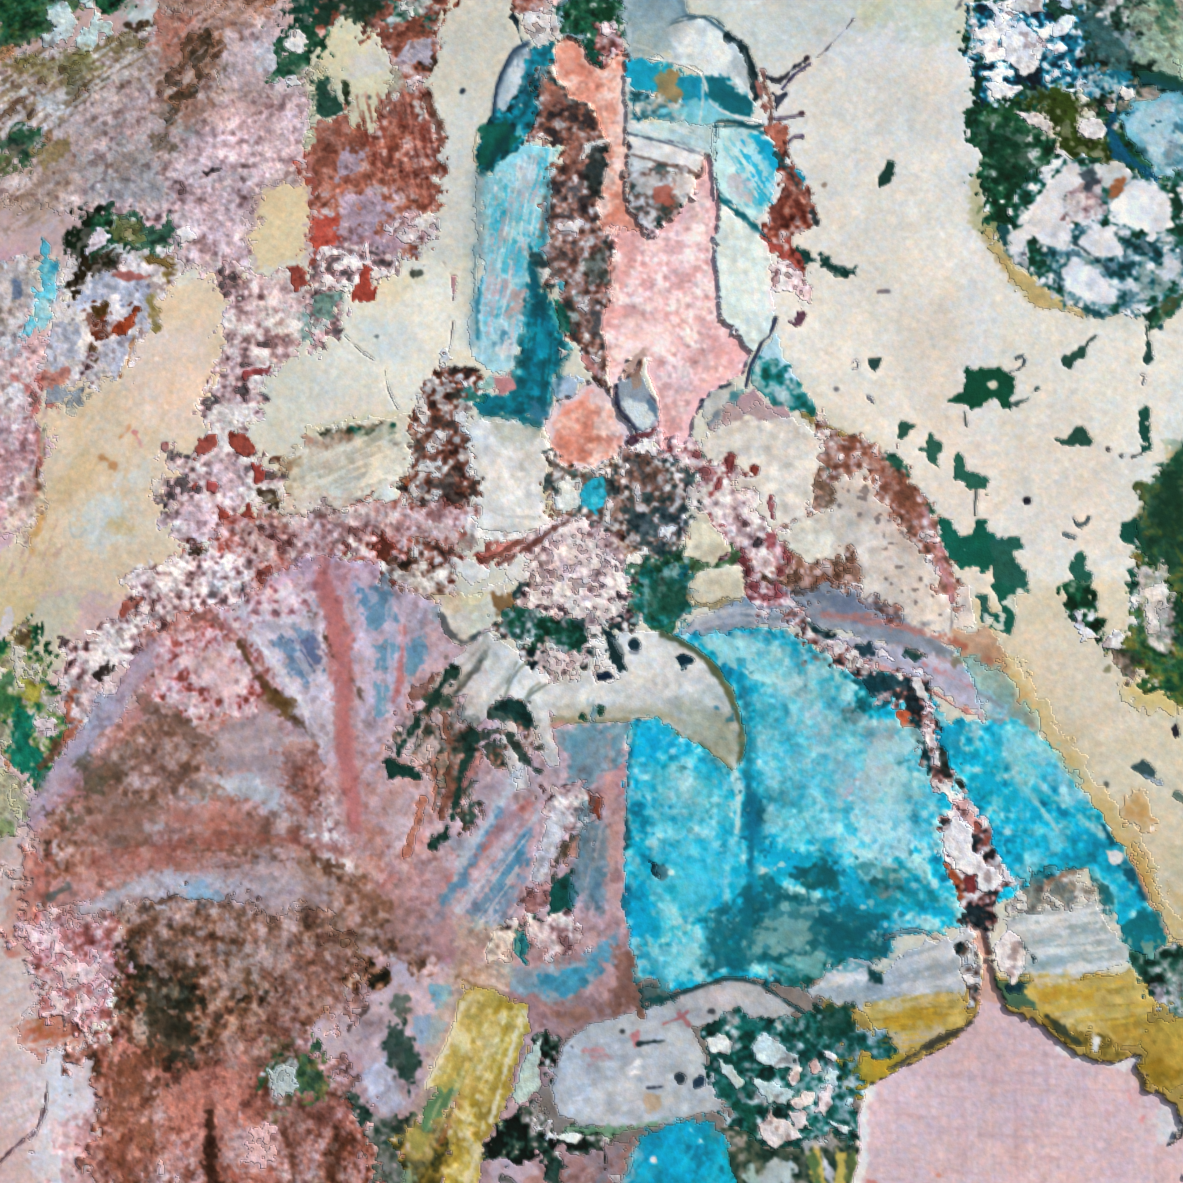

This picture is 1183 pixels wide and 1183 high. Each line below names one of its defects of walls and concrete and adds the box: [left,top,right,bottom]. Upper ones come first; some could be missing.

crack [0,1083,48,1168]